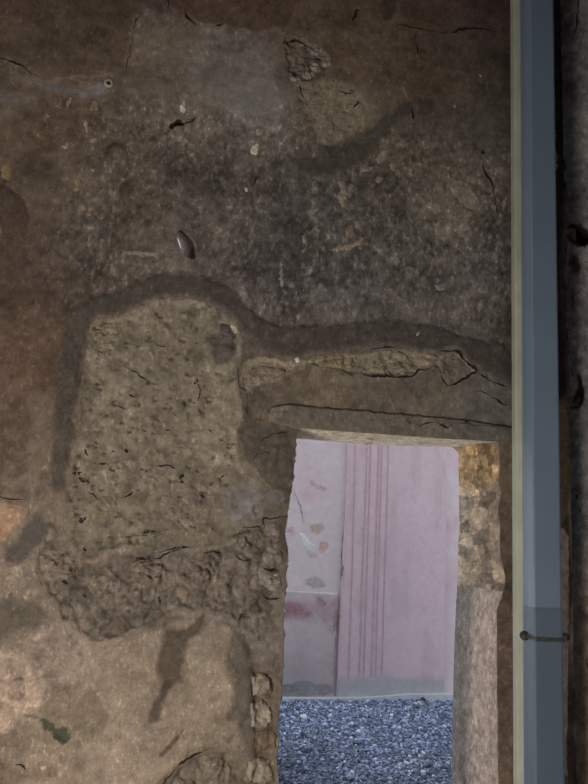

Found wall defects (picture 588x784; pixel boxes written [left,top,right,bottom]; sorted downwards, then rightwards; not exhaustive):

crack [166,0,225,28]
crack [383,23,503,56]
crack [0,57,47,86]
peeling [170,0,369,155]
crack [481,150,506,238]
crack [357,348,511,407]
crack [408,420,512,430]
crack [0,494,29,502]
crack [161,748,213,784]